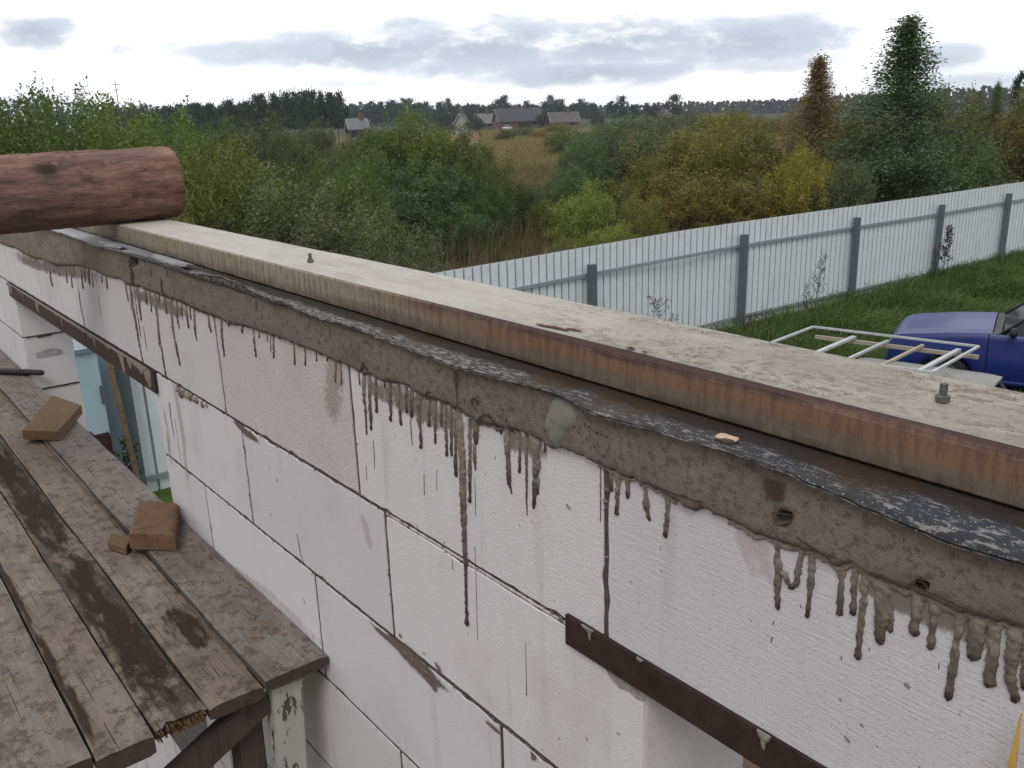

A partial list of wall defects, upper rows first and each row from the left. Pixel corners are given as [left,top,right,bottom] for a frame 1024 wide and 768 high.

water stain [17,254,108,289]
water stain [124,260,275,380]
water stain [293,343,342,386]
water stain [358,372,480,626]
water stain [499,427,547,515]
water stain [600,468,671,538]
water stain [768,532,816,618]
water stain [832,564,1024,703]